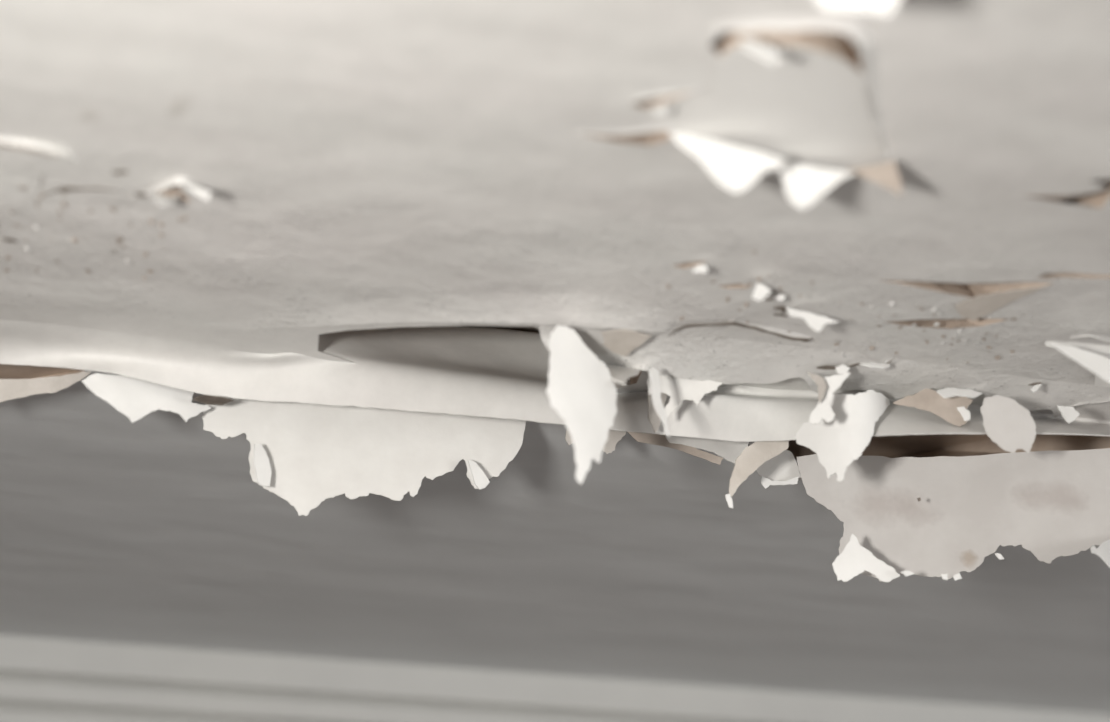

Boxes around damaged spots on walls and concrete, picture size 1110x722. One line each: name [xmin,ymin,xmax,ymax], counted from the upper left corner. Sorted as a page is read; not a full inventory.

peeling [574,0,902,210]
peeling [1026,179,1110,208]
peeling [0,261,1110,583]